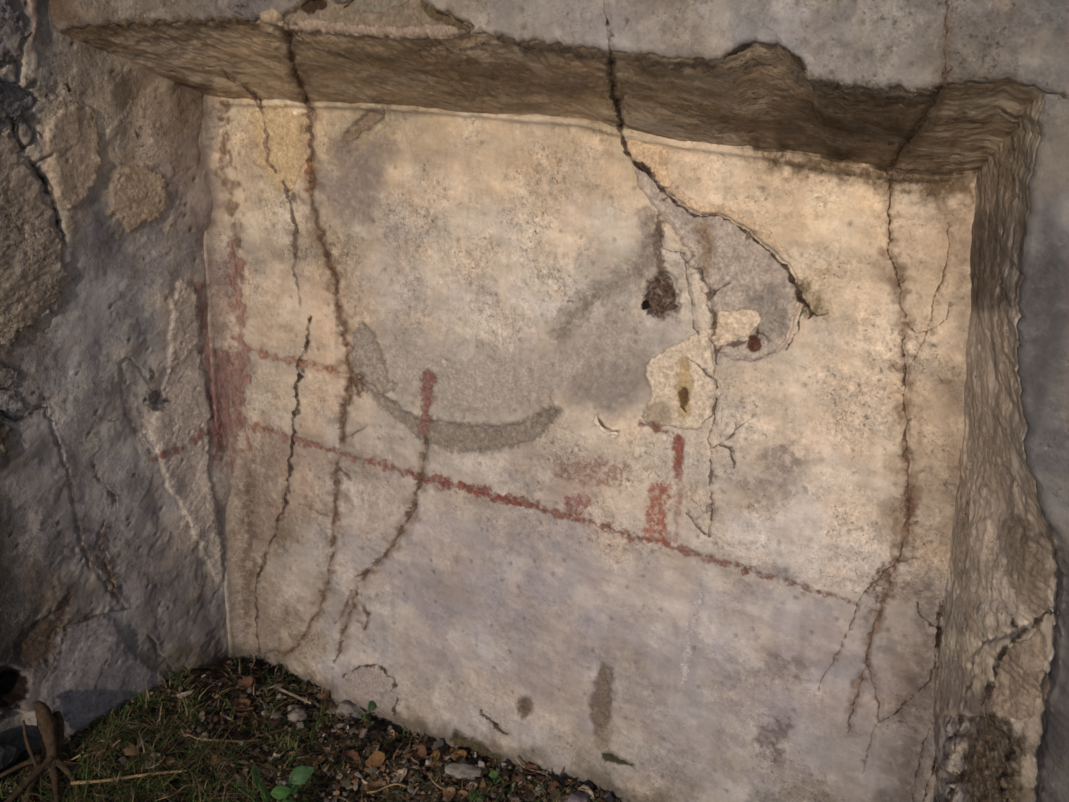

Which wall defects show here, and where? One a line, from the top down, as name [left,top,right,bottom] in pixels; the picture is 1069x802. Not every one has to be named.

peeling [27,0,40,41]
spalling [61,0,474,41]
spalling [481,30,751,72]
peeling [42,103,102,208]
peeling [249,104,308,196]
spalling [341,111,384,147]
crack [202,22,428,662]
spalling [351,139,797,453]
crack [603,2,827,538]
crack [819,0,953,772]
crack [912,610,1057,802]